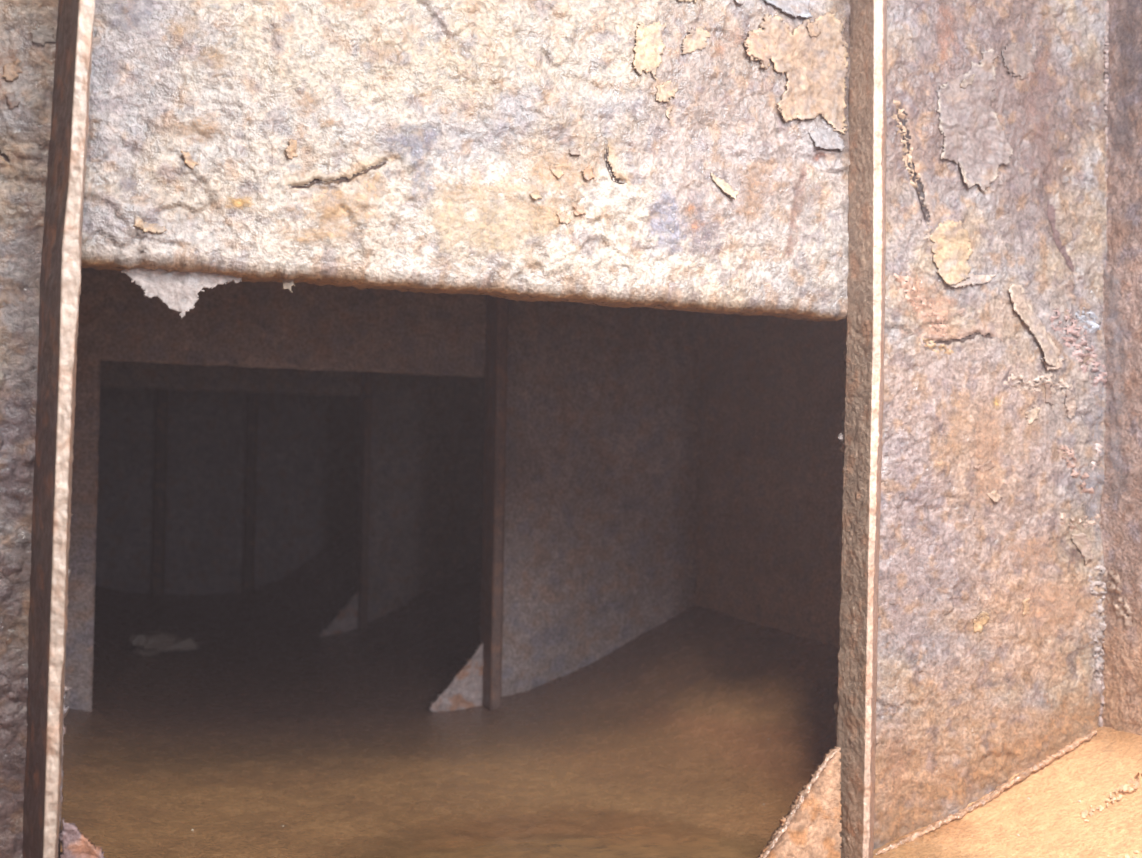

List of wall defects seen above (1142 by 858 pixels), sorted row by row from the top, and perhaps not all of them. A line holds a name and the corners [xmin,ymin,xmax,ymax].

peeling [633,21,678,120]
peeling [743,0,849,160]
peeling [936,41,1037,192]
peeling [121,268,244,319]
peeling [891,99,996,288]
peeling [1008,284,1064,425]
spalling [1047,200,1074,272]